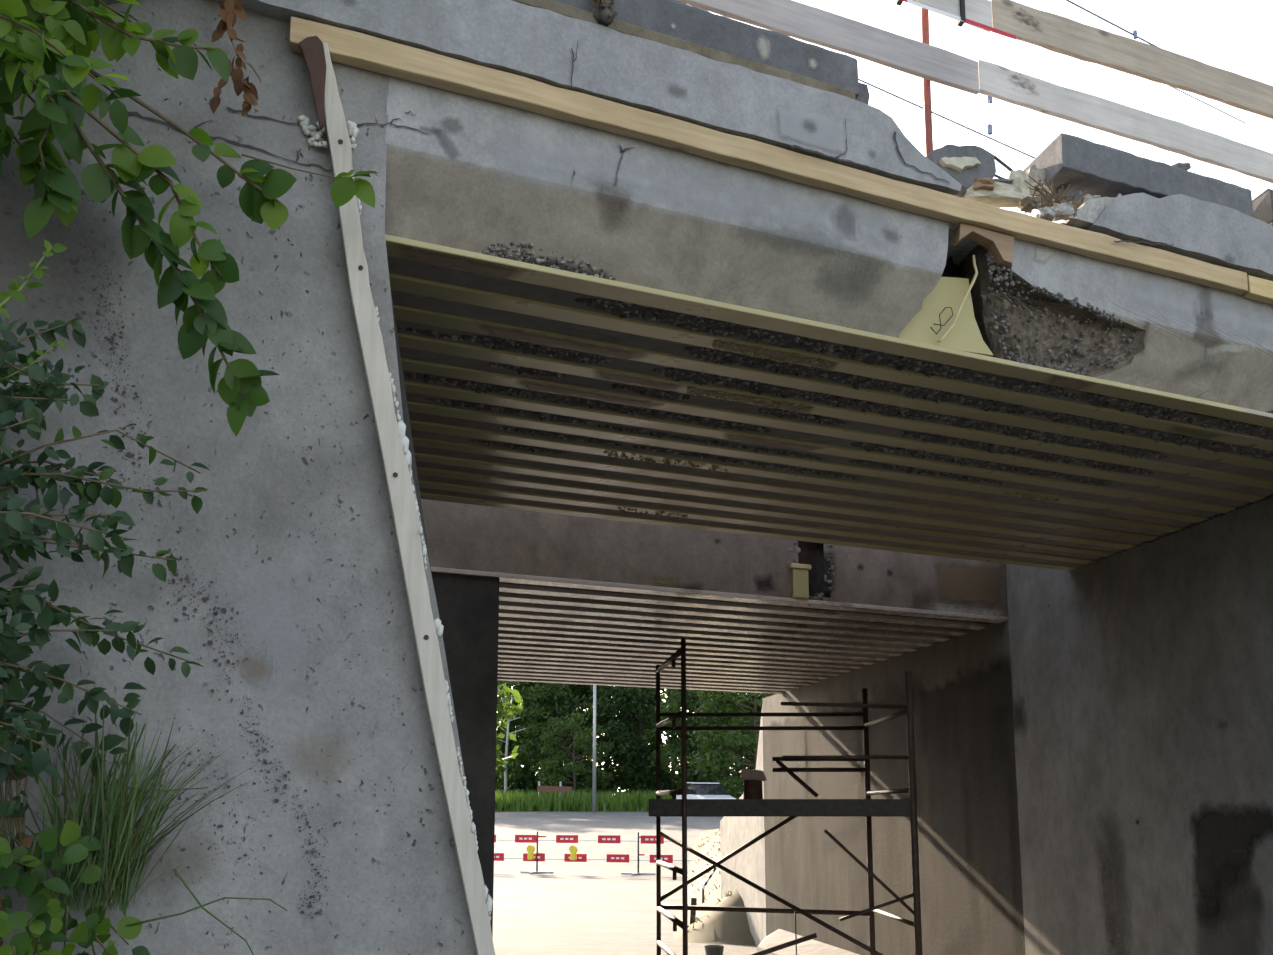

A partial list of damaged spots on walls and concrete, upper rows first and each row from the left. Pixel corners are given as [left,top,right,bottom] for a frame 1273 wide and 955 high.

crack [128,107,332,171]
crack [613,146,636,187]
crack [791,120,950,183]
spalling [941,245,1145,378]
water stain [1192,806,1273,955]